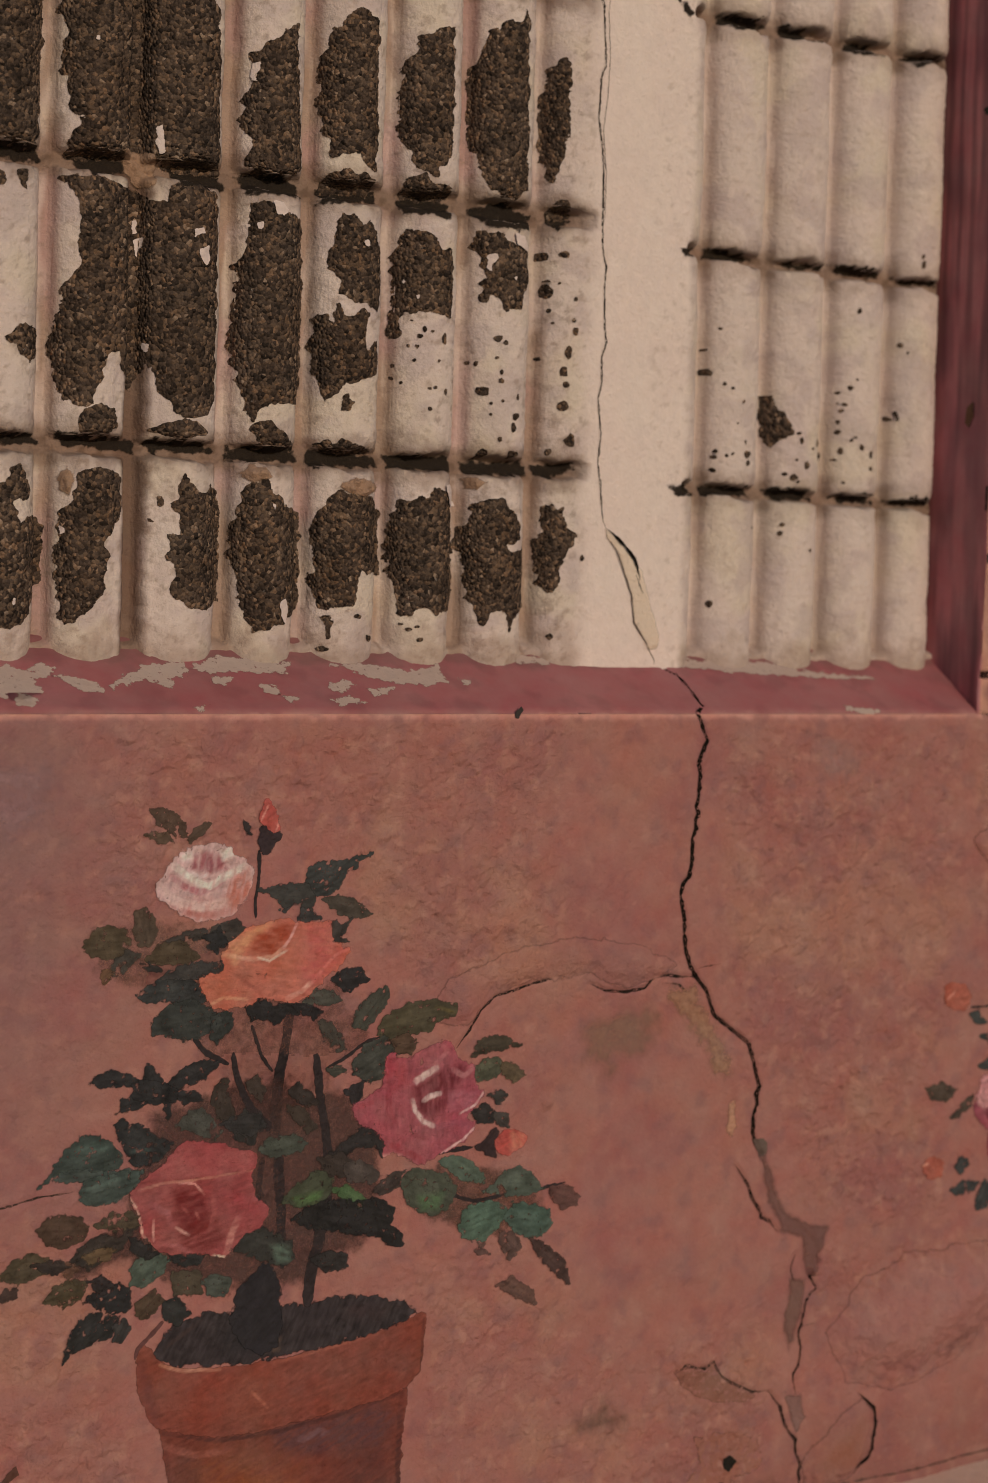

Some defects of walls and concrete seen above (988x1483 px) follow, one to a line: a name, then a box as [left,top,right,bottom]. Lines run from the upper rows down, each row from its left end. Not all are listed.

peeling [0,0,575,460]
peeling [556,297,579,411]
peeling [0,463,122,629]
peeling [147,473,584,706]
peeling [0,655,300,707]
crack [593,0,822,1483]
peeling [682,658,877,680]
peeling [843,705,880,716]
crack [458,978,551,1046]